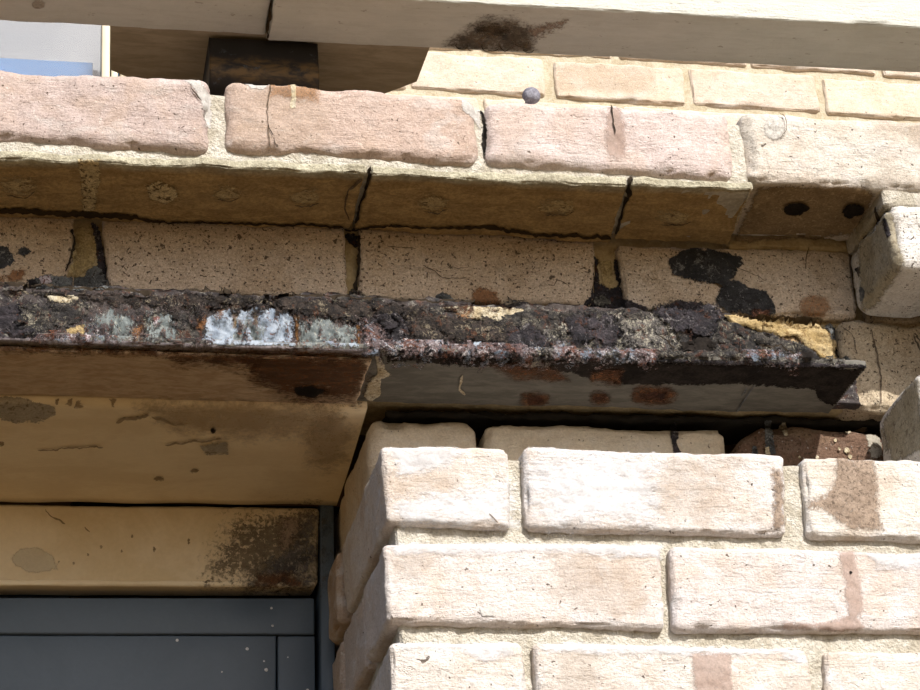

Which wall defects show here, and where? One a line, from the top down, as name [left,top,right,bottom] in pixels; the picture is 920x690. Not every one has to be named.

damp [445,16,569,53]
crack [266,85,276,147]
peeling [0,246,31,269]
crack [0,167,633,279]
rust [0,286,866,407]
peeling [459,248,846,376]
mould [202,509,326,595]